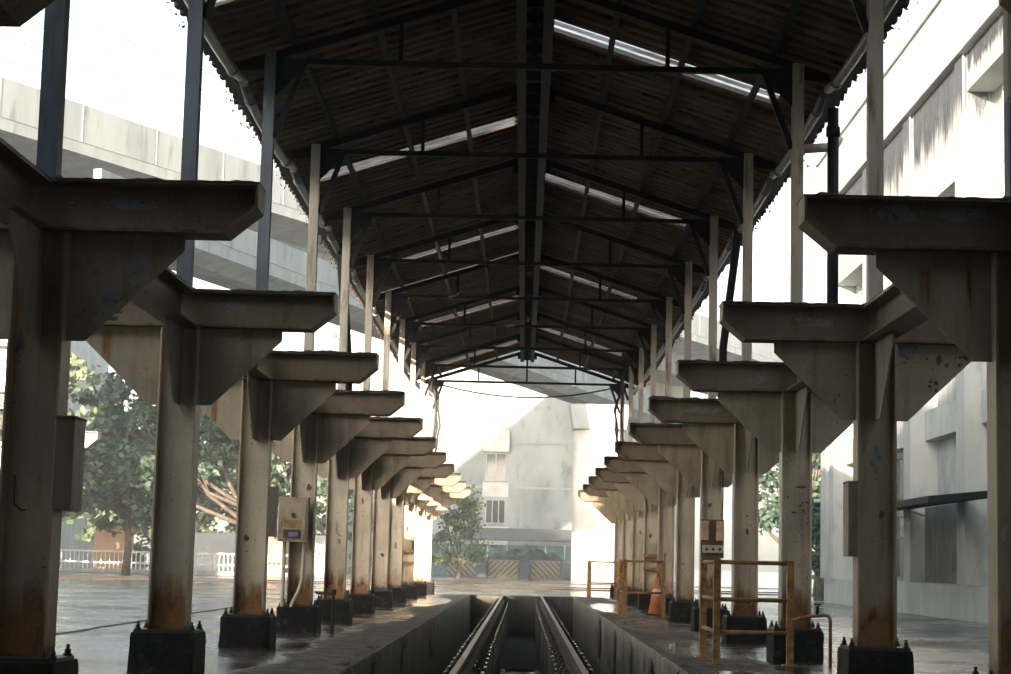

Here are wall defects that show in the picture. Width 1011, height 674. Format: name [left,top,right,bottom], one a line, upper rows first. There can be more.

water stain [884,12,1003,196]
rust [151,592,185,629]
rust [235,591,262,614]
rust [859,614,892,646]
rust [1001,610,1011,674]